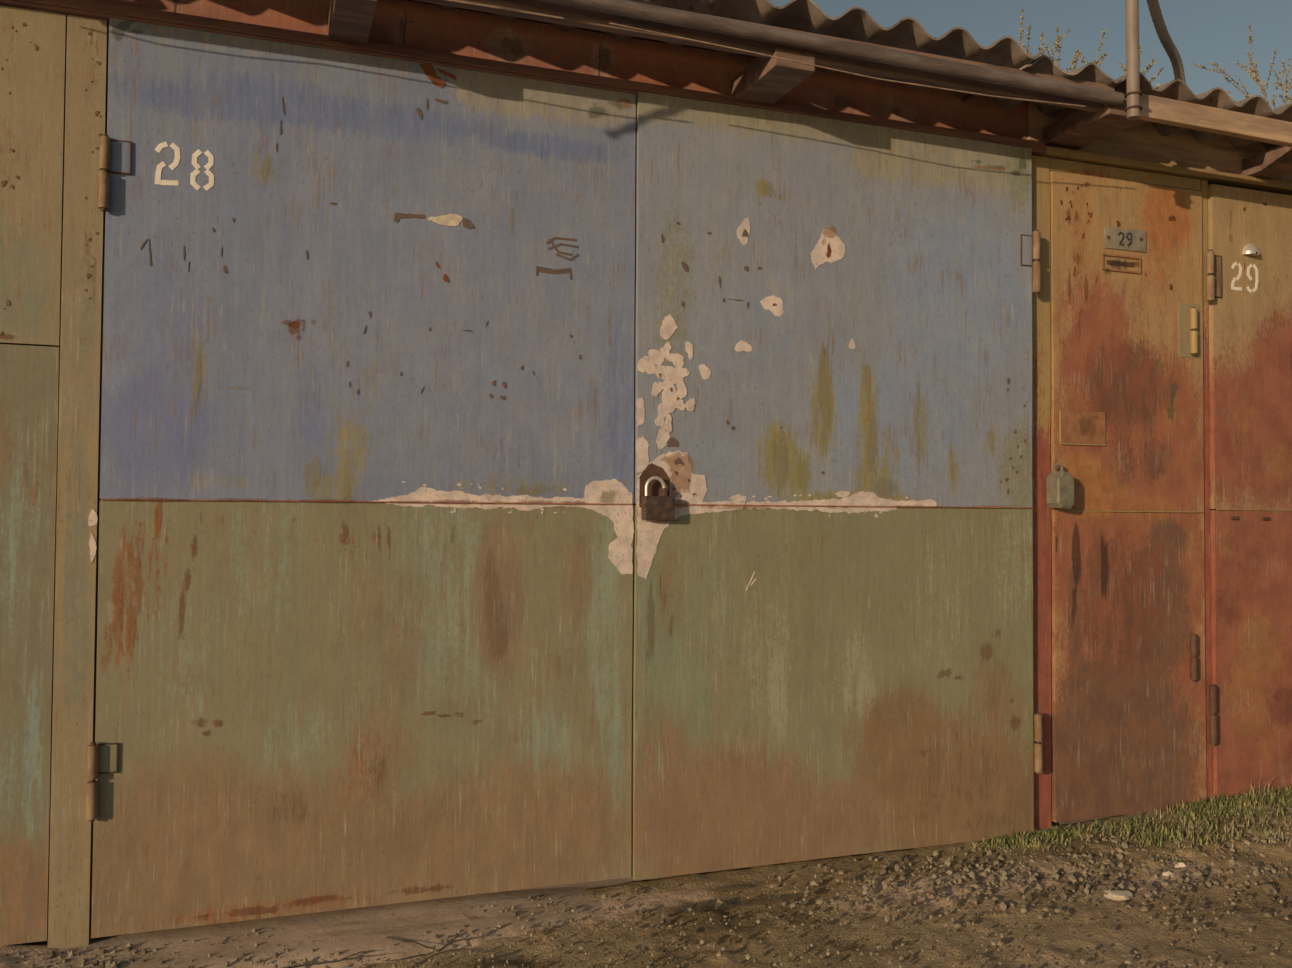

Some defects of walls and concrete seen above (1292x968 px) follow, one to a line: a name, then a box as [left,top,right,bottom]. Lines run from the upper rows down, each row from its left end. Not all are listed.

rust [419,63,457,104]
peeling [737,217,750,245]
peeling [811,228,845,269]
peeling [760,295,784,317]
peeling [374,314,937,579]
rust [1056,523,1081,623]